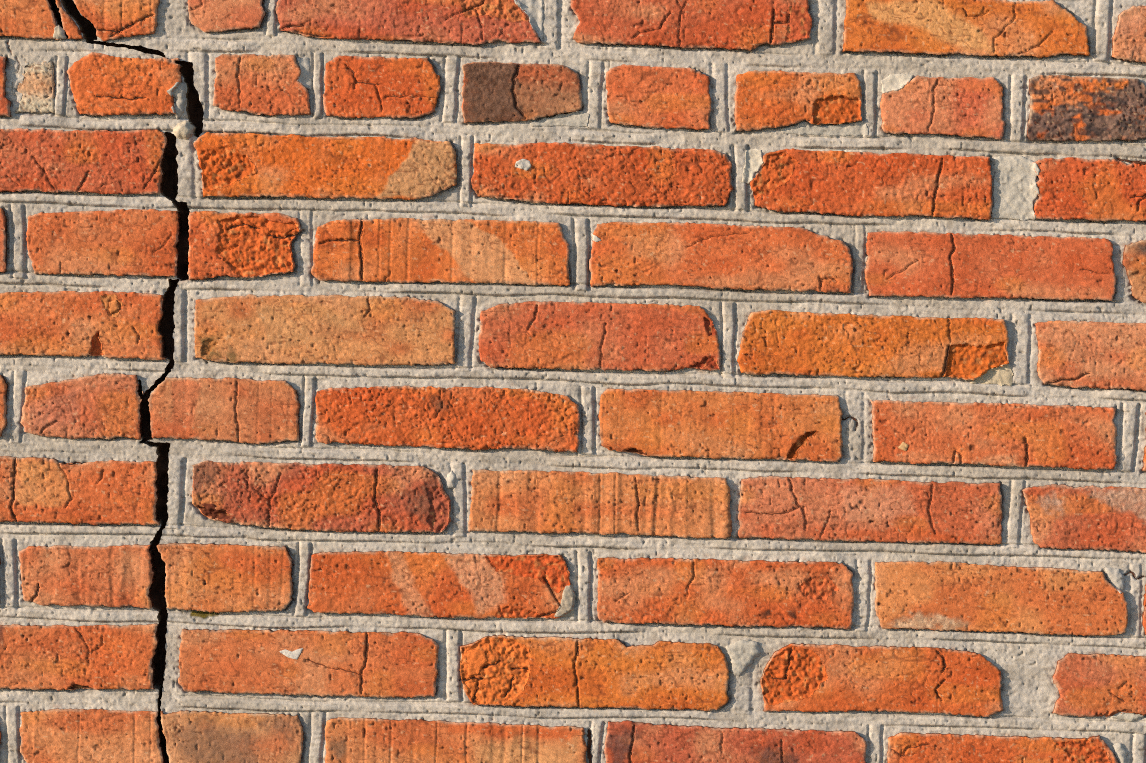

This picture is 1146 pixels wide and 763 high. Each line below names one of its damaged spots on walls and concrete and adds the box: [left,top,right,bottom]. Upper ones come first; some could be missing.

crack [9,461,17,521]
crack [52,0,204,763]